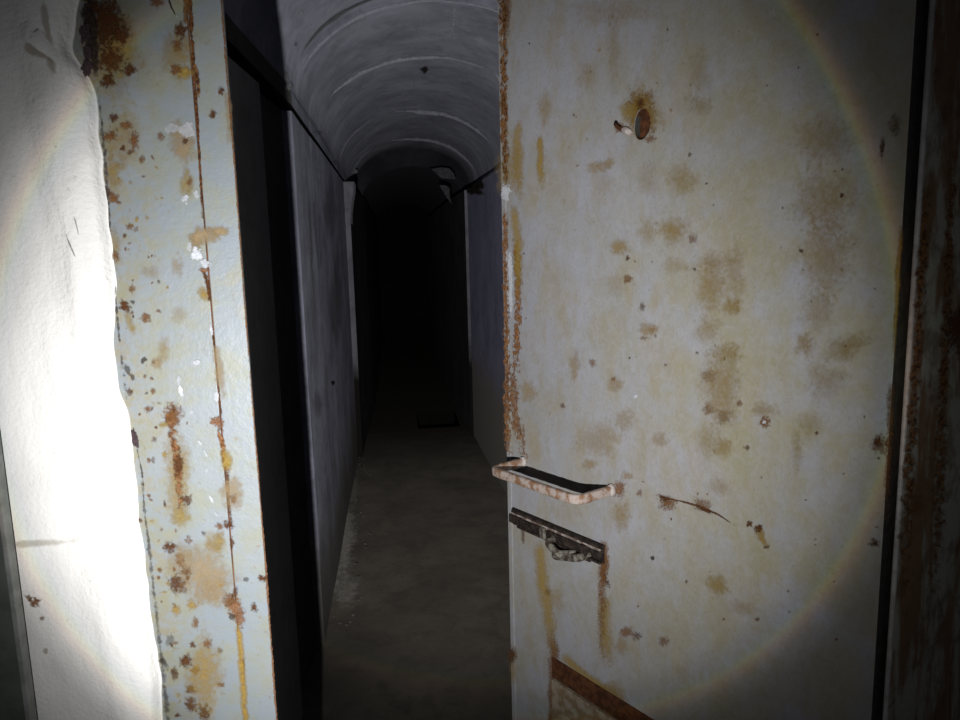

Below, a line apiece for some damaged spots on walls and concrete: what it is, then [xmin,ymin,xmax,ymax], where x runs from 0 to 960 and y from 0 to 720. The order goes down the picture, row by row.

rust [81,0,136,88]
rust [171,0,215,206]
rust [498,0,522,183]
rust [119,280,160,322]
rust [502,210,532,459]
rust [897,198,928,555]
rust [155,403,191,522]
rust [210,417,241,549]
rust [157,543,198,593]
rust [171,642,223,718]
rust [224,589,256,720]
rust [598,543,631,654]